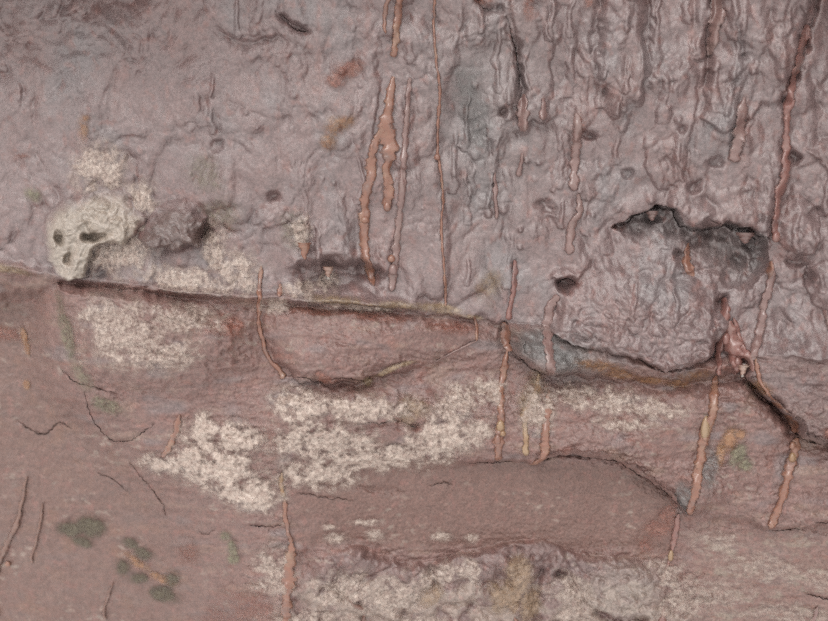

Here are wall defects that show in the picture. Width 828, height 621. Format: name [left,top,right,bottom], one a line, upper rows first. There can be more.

rust [382,0,403,57]
rust [358,76,412,291]
rust [565,113,584,255]
rust [771,24,811,242]
efflorescence [138,377,505,514]
rust [492,260,519,461]
rust [520,294,560,466]
crack [545,455,682,511]
rust [662,261,802,582]